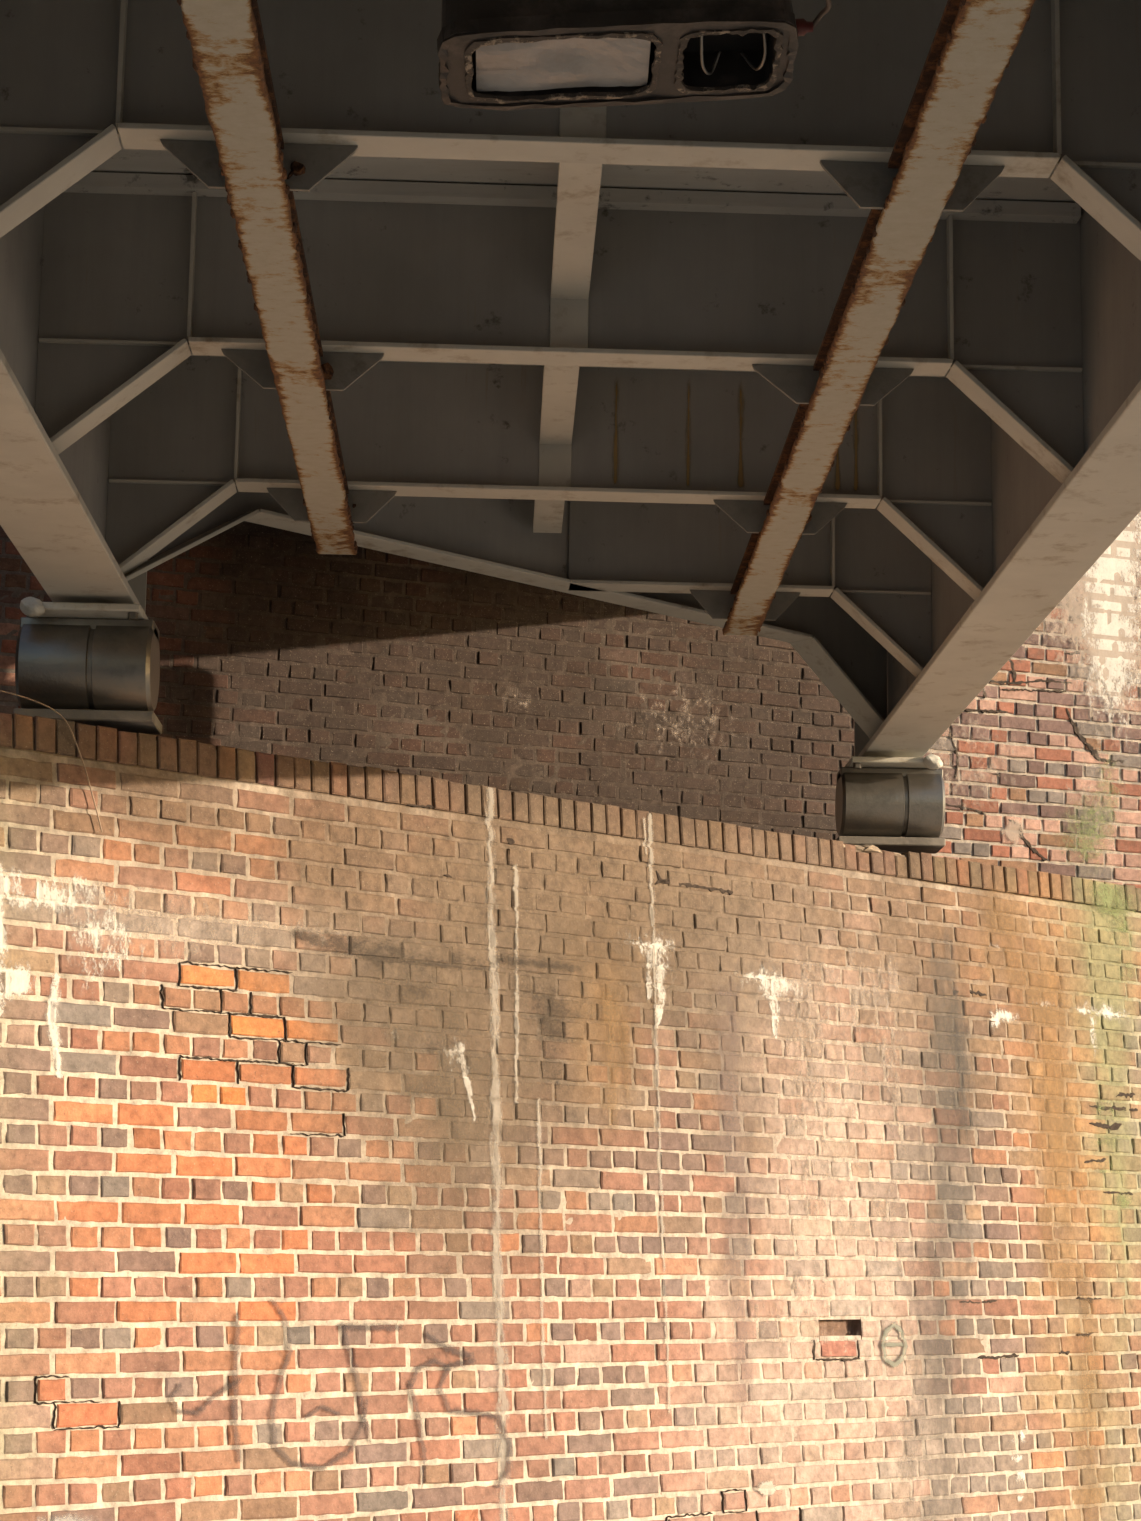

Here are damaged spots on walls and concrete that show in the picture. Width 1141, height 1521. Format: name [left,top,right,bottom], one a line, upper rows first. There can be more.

crack [945,651,1124,861]
damp [47,972,63,1078]
damp [0,864,260,1016]
crack [160,961,351,1137]
damp [384,787,519,1521]
damp [632,813,671,1412]
damp [743,960,905,1145]
damp [991,1009,1015,1027]
damp [1077,1004,1127,1047]
crack [34,1375,121,1431]
damp [536,1099,548,1438]
spalling [812,1317,862,1361]